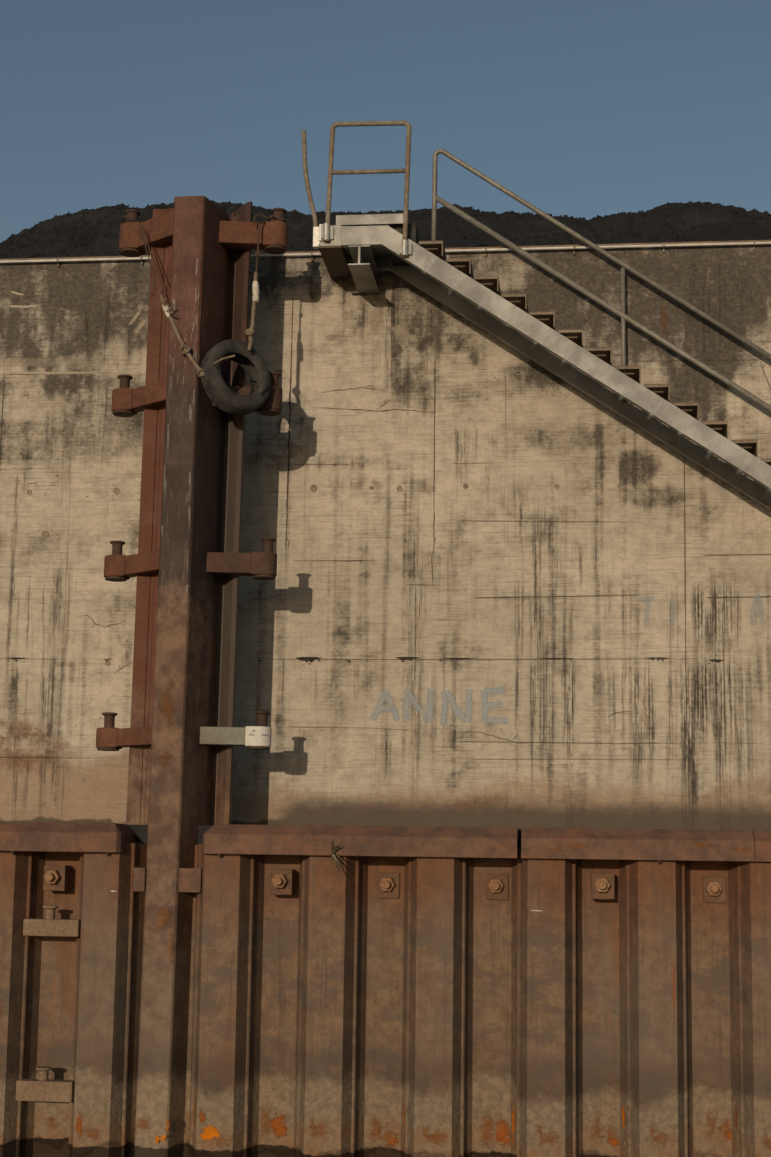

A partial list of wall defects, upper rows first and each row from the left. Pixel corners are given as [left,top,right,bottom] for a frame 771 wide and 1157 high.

leakage [128,304,149,349]
leakage [693,590,739,643]
leakage [682,672,730,790]
rust [193,1093,226,1143]
rust [262,1113,287,1137]
rust [481,1103,515,1149]